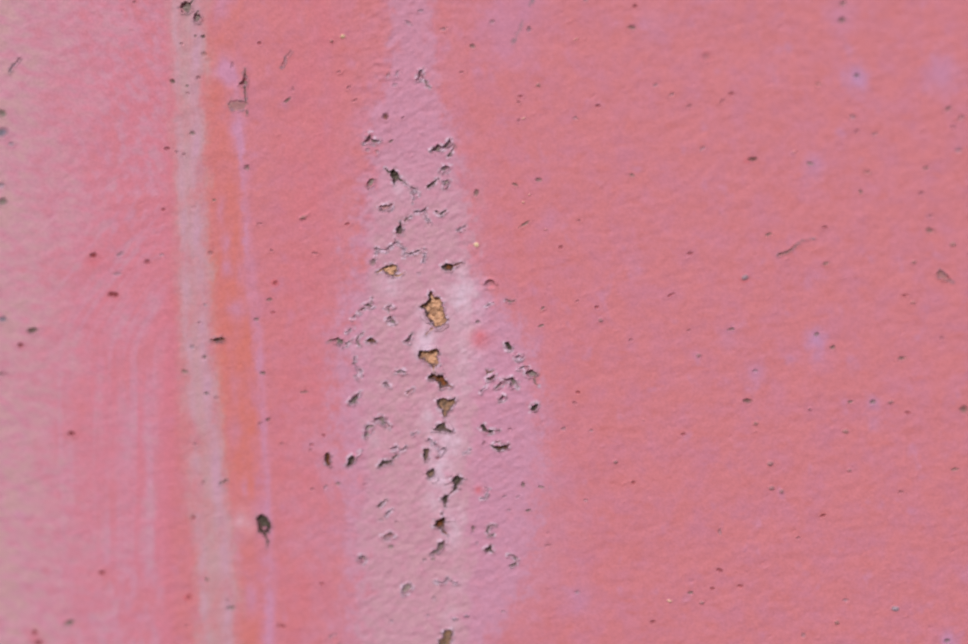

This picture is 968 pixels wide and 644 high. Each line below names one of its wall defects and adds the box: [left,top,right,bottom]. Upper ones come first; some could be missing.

peeling [428,137,453,190]
peeling [393,220,405,236]
peeling [366,257,407,279]
peeling [439,260,465,273]
peeling [325,335,378,349]
peeling [403,289,458,435]
peeling [485,340,540,403]
peeling [306,432,332,468]
peeling [345,414,393,468]
peeling [478,423,516,452]
peeling [419,446,467,565]
peeling [437,627,454,644]